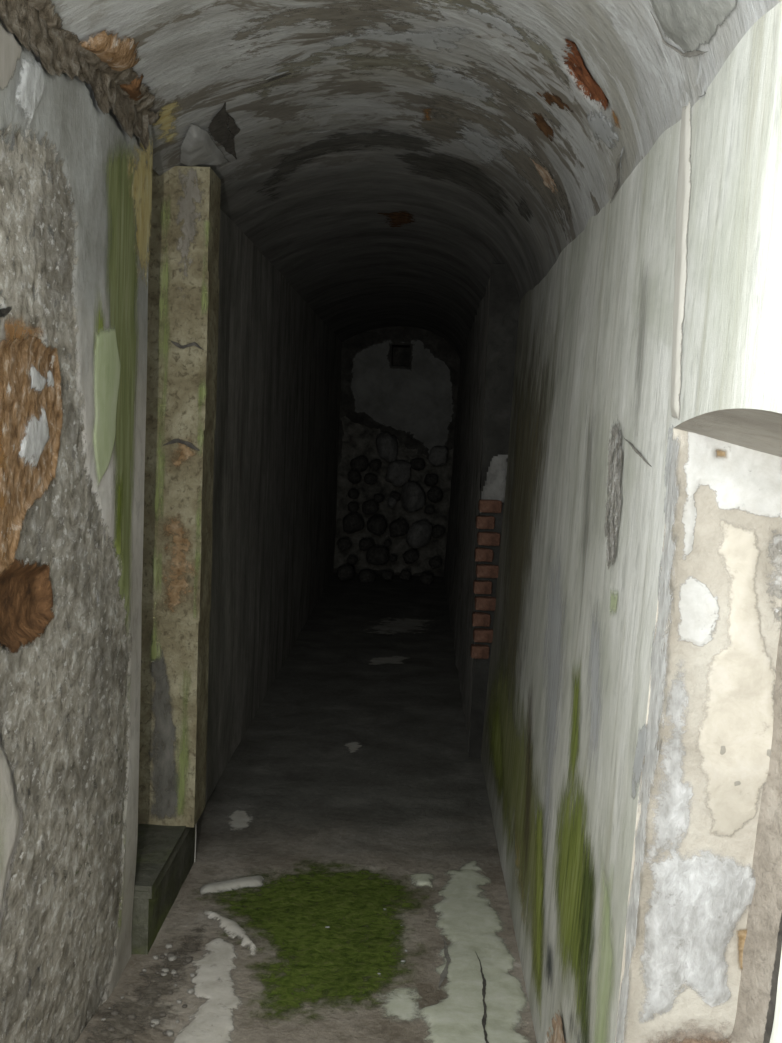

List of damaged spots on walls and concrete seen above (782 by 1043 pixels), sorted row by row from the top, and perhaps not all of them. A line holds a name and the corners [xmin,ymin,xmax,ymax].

peeling [230,0,619,240]
flaking render [0,0,161,1043]
flaking render [149,647,179,819]
leakage [514,561,601,1004]
peeling [616,426,782,1043]
crack [439,936,451,989]
crack [475,951,489,1043]
leakage [570,850,594,1043]